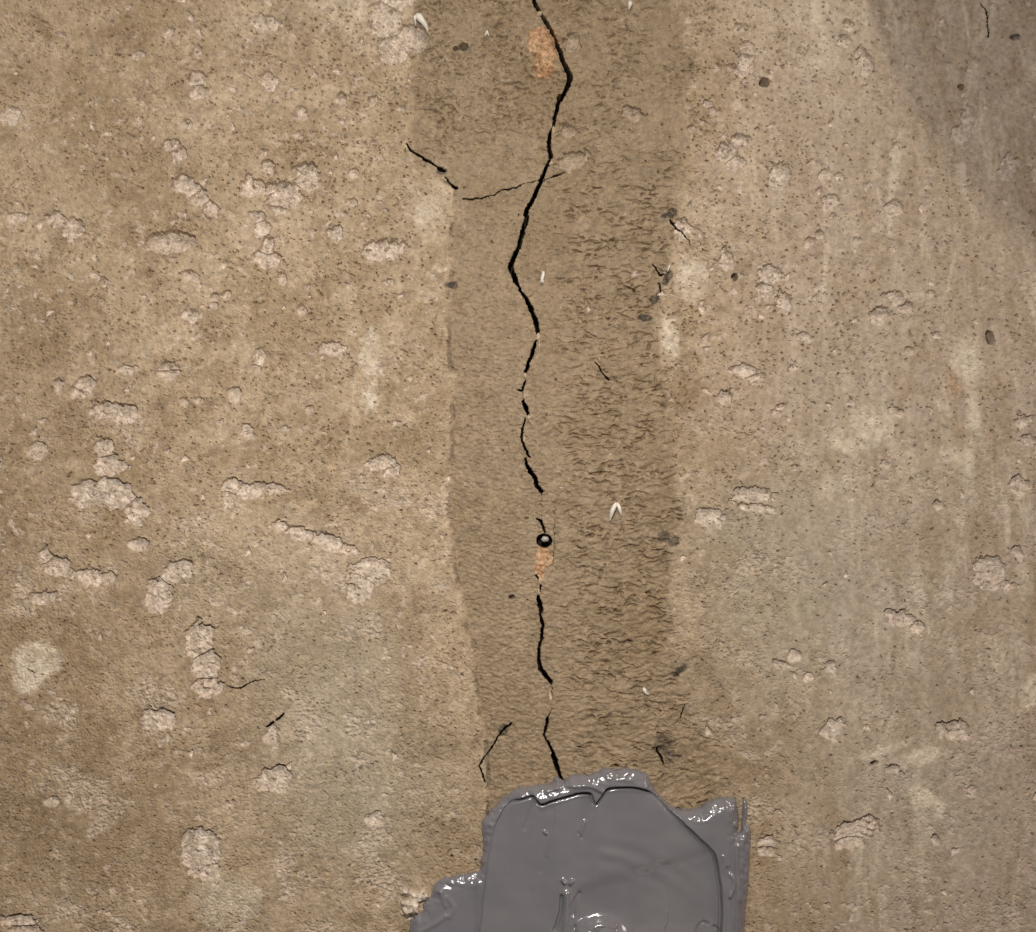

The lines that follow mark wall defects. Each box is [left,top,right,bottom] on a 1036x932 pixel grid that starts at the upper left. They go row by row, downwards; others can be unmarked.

corrosion [525,25,563,81]
crack [406,0,573,782]
corrosion [533,546,554,587]